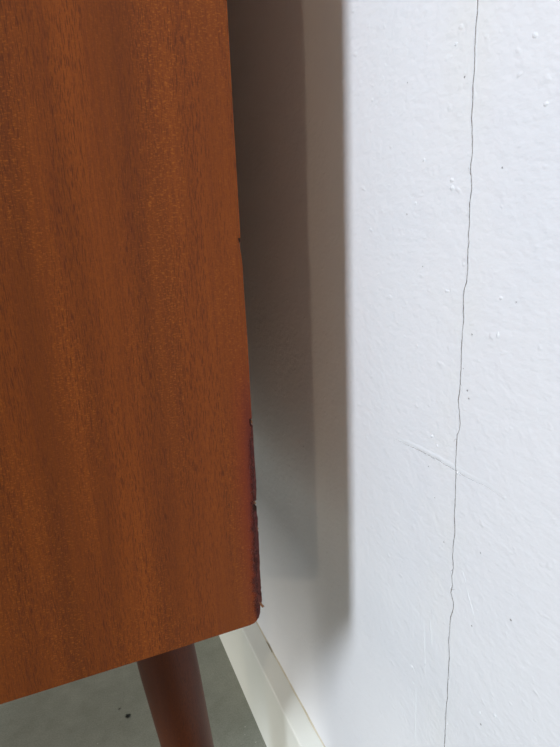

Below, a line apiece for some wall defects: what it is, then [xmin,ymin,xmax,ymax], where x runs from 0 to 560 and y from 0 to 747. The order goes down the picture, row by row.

crack [443,0,480,747]